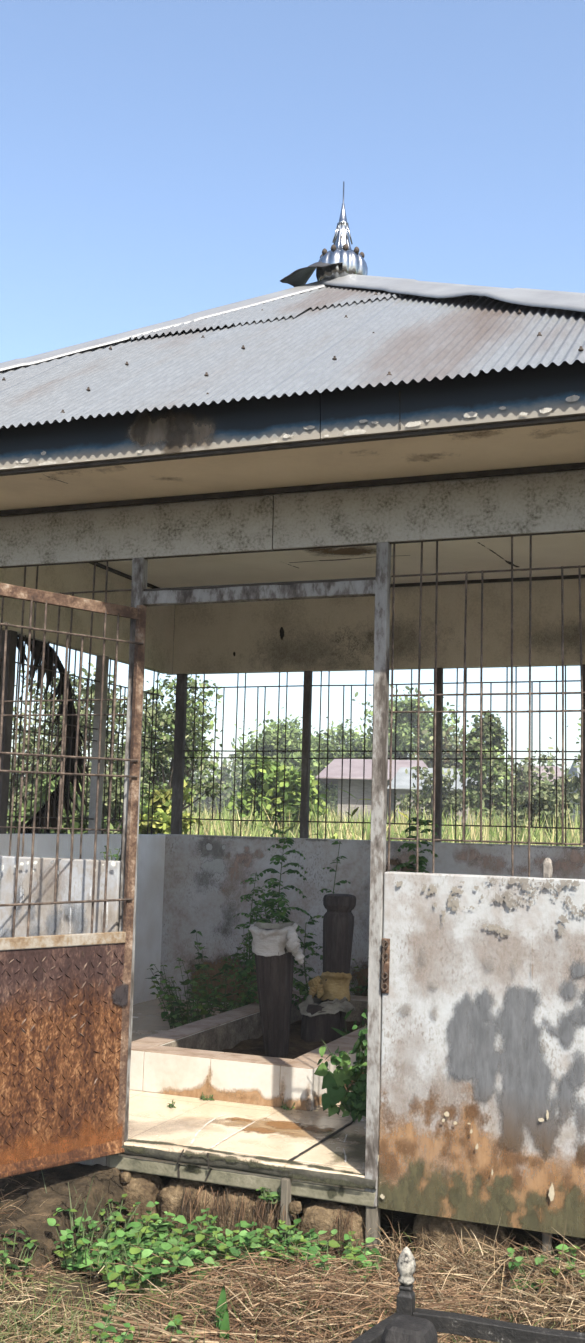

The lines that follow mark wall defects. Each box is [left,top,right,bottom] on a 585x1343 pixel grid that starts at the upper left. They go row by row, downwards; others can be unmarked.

water stain [129,410,214,453]